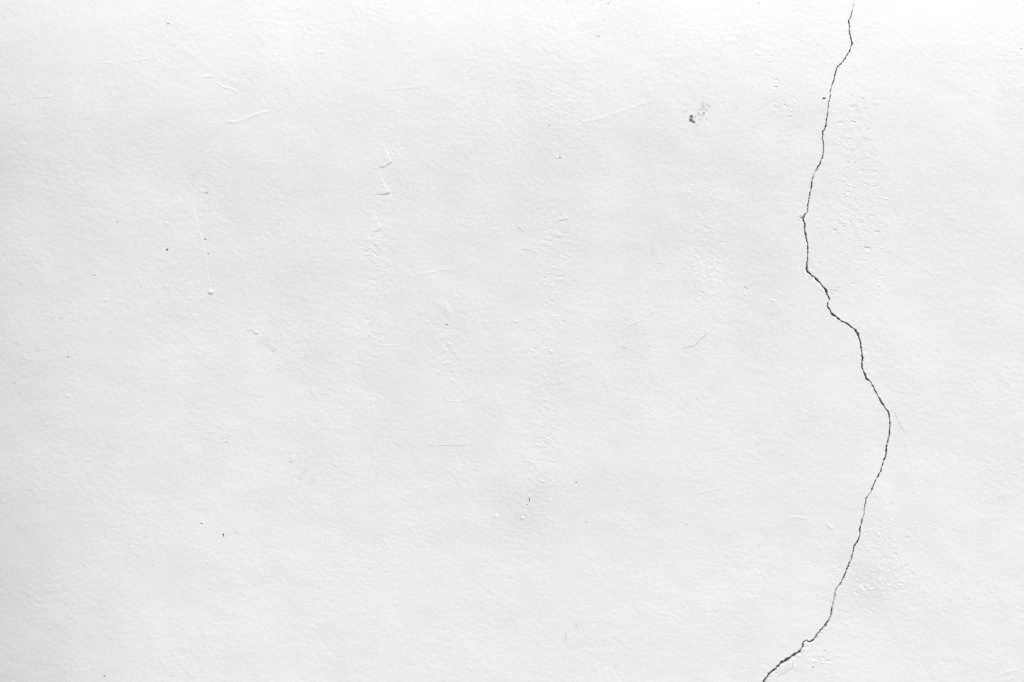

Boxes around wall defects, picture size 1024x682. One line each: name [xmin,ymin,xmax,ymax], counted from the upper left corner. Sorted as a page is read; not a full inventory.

crack [760,0,907,682]